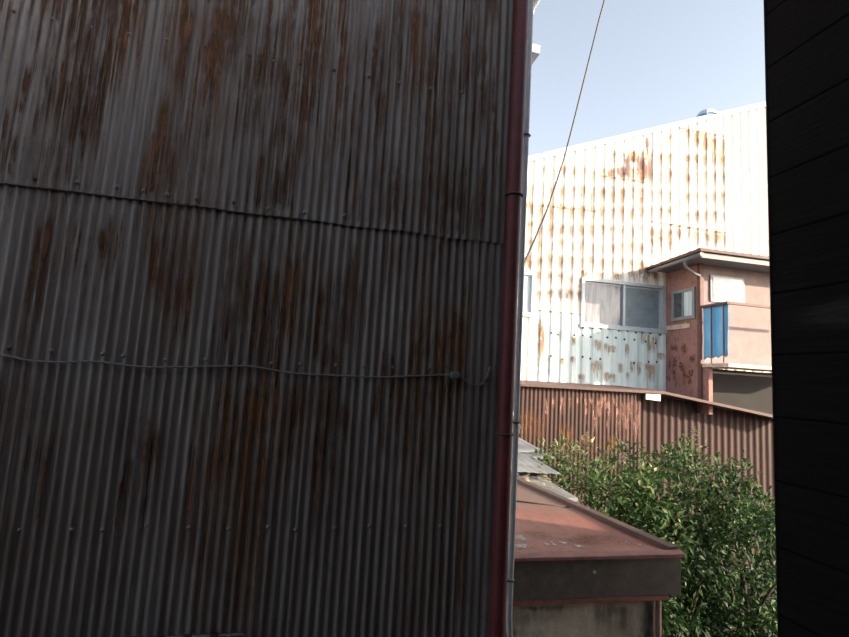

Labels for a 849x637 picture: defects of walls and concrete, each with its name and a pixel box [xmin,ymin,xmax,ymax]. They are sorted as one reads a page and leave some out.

rust [1,64,35,168]
rust [29,221,52,309]
rust [33,0,147,158]
rust [140,0,248,341]
rust [178,0,327,576]
rust [313,158,361,440]
rust [329,0,363,143]
rust [538,324,550,372]
rust [519,127,727,298]
rust [592,362,654,381]